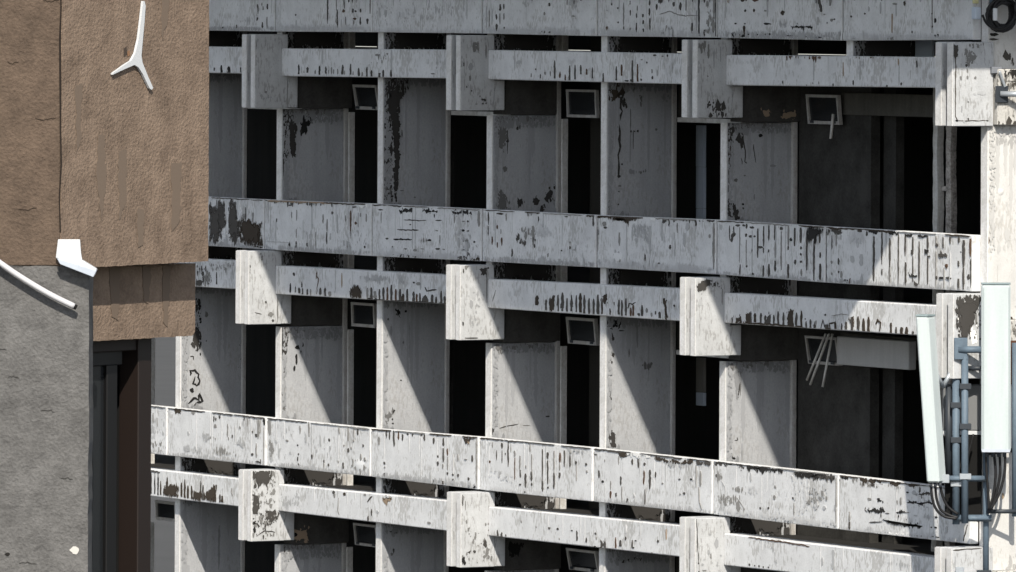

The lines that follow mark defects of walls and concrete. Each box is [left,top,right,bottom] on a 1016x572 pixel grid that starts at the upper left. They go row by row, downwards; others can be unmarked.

damp [209,0,991,81]
damp [208,47,981,339]
spalling [222,202,263,247]
damp [142,265,171,327]
damp [151,262,967,572]
spalling [163,483,179,498]
spalling [191,484,217,502]
spalling [618,452,693,477]
damp [989,454,999,500]